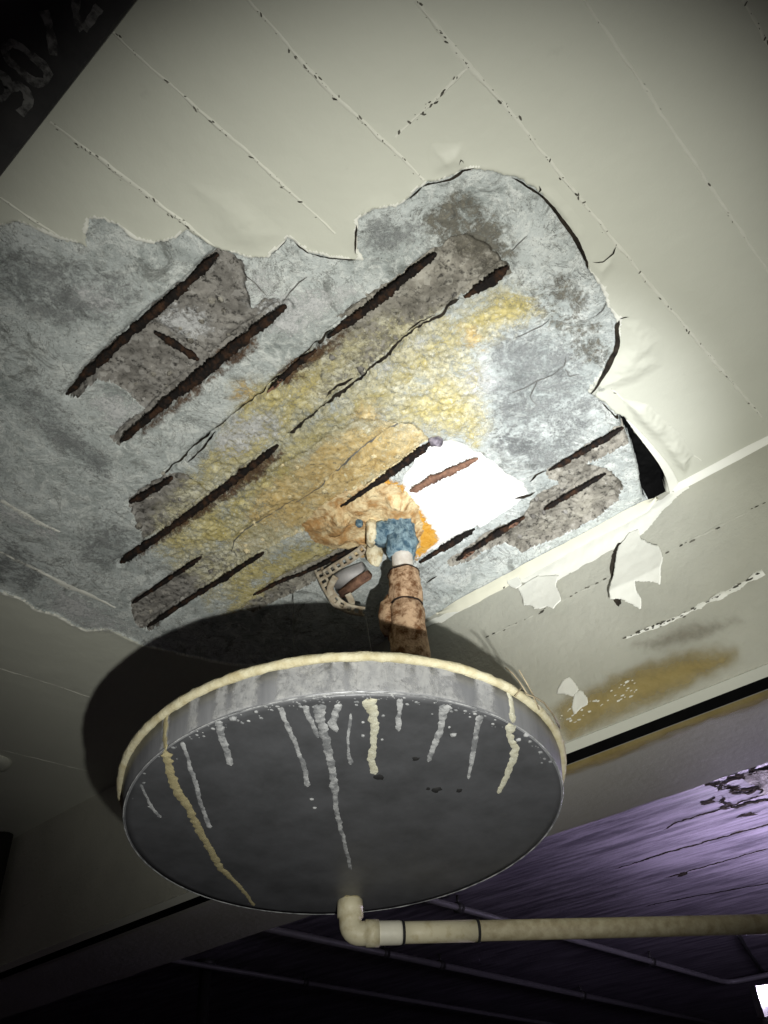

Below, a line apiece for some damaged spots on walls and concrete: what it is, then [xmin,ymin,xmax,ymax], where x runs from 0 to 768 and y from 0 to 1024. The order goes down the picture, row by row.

crack [411,160,474,198]
water stain [367,191,516,274]
crack [513,178,616,269]
corrosion [279,333,345,384]
crack [165,376,278,473]
corrosion [136,404,420,560]
peeling [0,165,695,667]
water stain [151,272,607,614]
corrosion [415,510,438,560]
peeling [557,677,588,714]
water stain [557,654,730,736]
water stain [566,690,768,775]